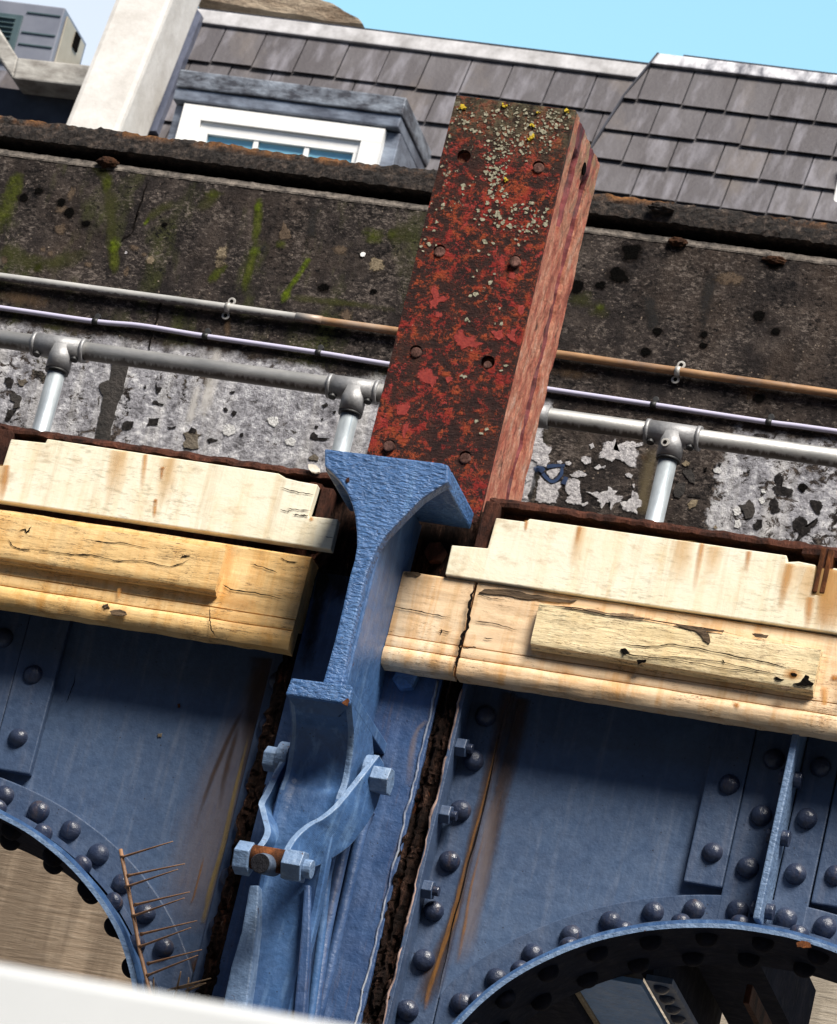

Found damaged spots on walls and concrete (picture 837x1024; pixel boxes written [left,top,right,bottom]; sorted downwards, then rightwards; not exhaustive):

peeling [4,377,28,422]
peeling [95,364,134,441]
spalling [144,384,243,450]
peeling [310,403,336,441]
peeling [522,437,643,514]
peeling [673,460,722,509]
peeling [733,472,823,541]
crack [394,583,515,671]
corrosion [192,659,271,916]
corrosion [425,694,527,1000]